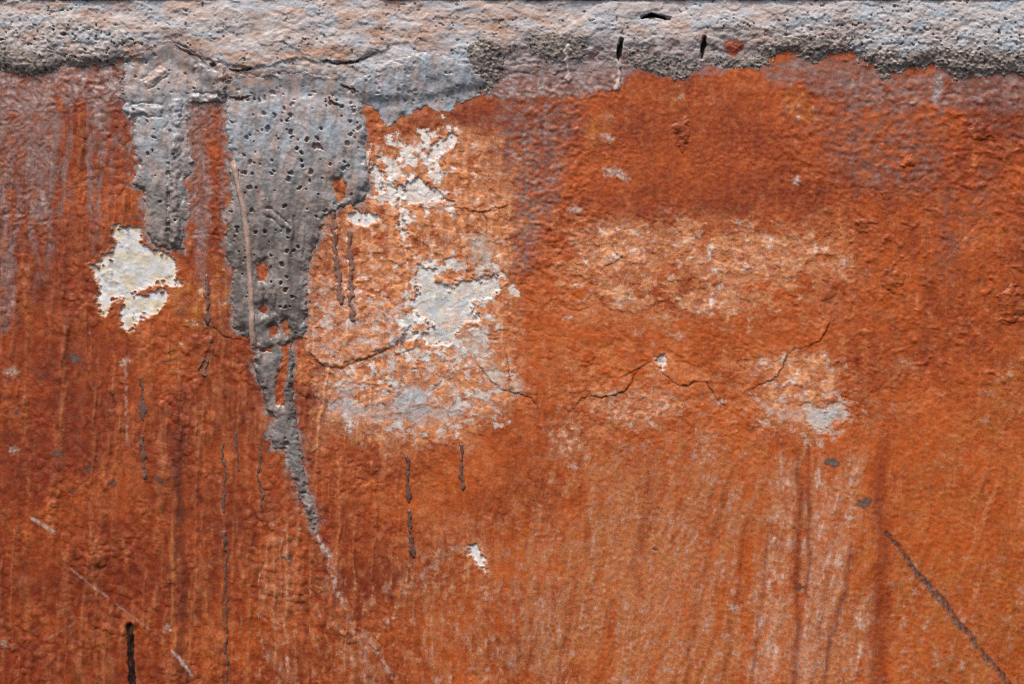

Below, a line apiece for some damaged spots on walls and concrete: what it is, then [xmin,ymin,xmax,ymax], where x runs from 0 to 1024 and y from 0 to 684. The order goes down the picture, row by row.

peeling [90,224,229,332]
peeling [303,114,525,456]
peeling [258,535,316,651]
peeling [330,554,460,683]
peeling [448,529,500,601]